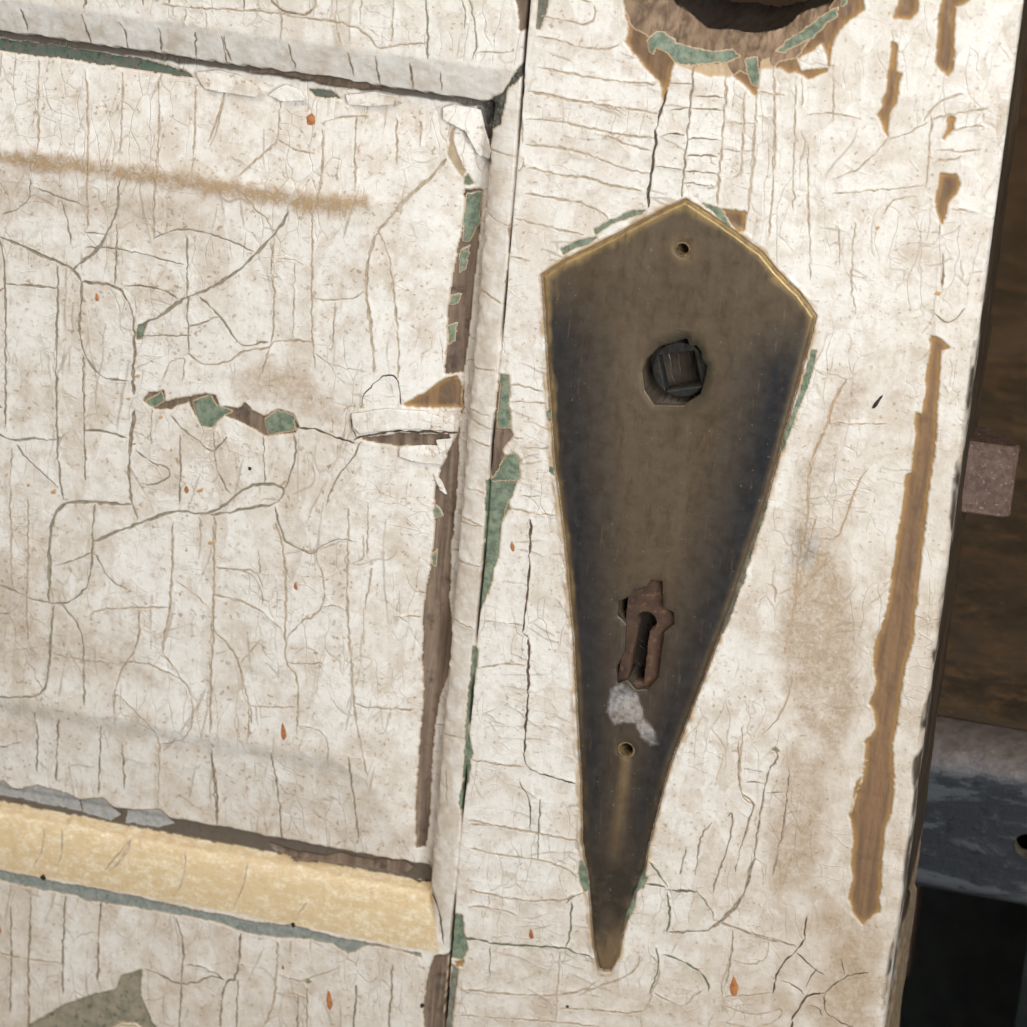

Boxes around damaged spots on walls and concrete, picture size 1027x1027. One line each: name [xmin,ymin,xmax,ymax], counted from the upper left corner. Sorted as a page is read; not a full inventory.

peeling [0,38,396,107]
crack [142,0,442,90]
crack [462,0,512,57]
crack [538,0,619,50]
peeling [624,0,865,100]
peeling [936,0,968,75]
peeling [143,390,299,435]
crack [0,24,552,840]
peeling [351,61,526,848]
peeling [849,336,949,924]
crack [410,379,886,1027]
crack [263,942,357,1027]